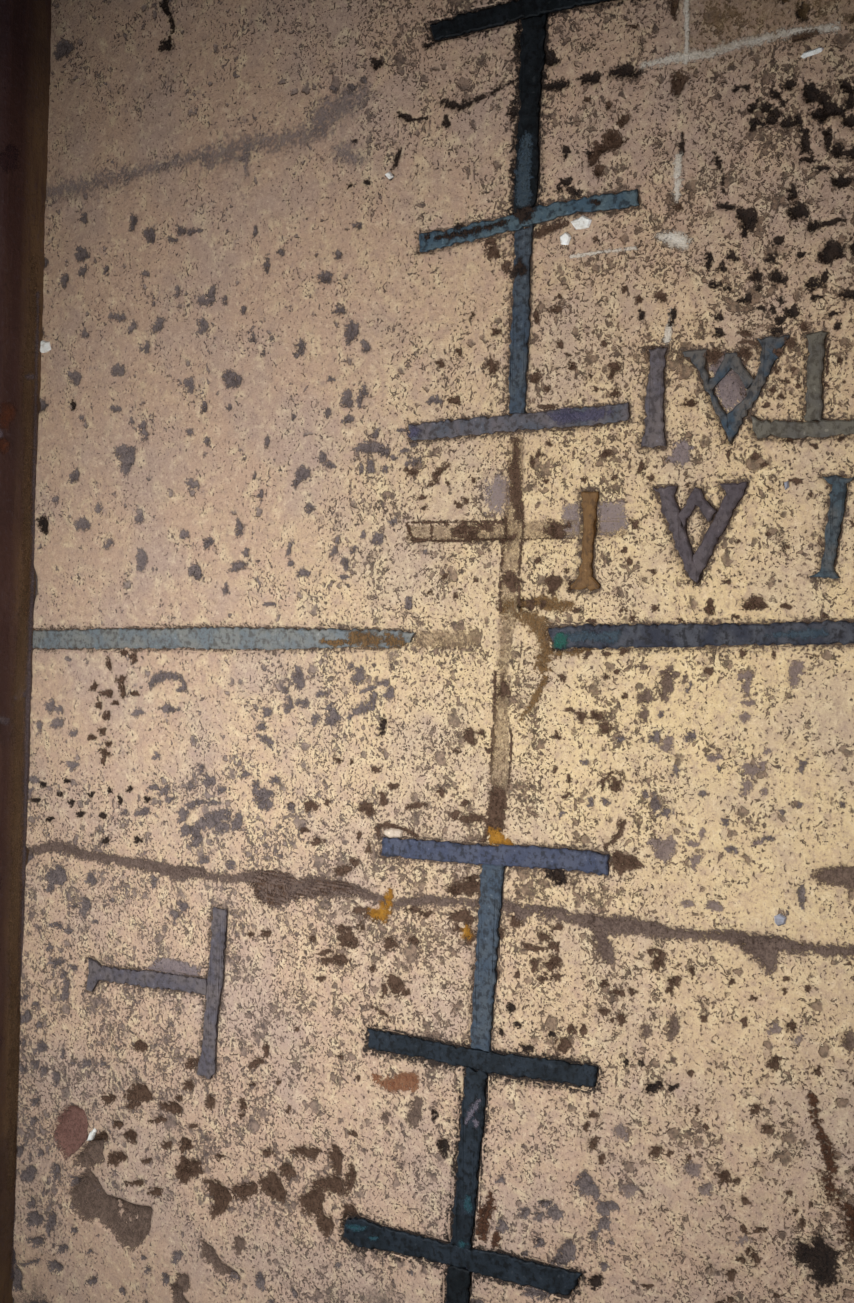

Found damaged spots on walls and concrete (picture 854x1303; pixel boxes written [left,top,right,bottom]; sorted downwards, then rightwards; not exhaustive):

crack [28,839,854,976]